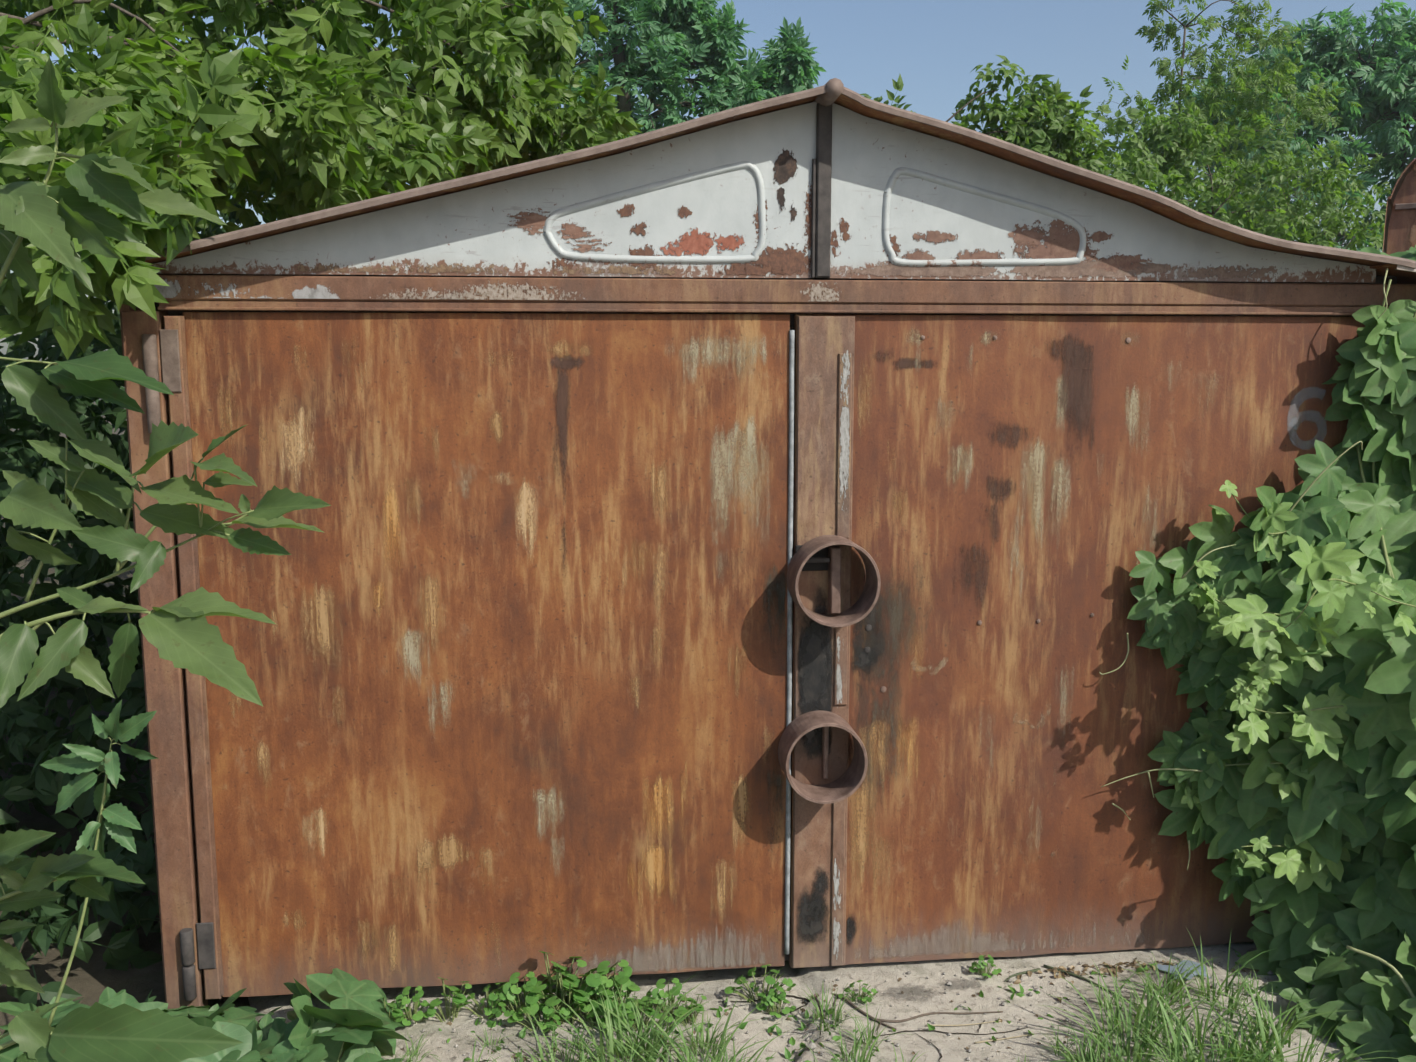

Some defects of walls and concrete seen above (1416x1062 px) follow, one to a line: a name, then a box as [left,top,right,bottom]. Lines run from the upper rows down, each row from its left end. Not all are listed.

peeling [508,183,842,302]
peeling [831,218,851,258]
peeling [883,219,1152,274]
peeling [154,278,340,299]
peeling [370,280,587,300]
rust [552,343,588,474]
rust [1052,335,1094,448]
rust [518,483,535,549]
rust [304,588,333,652]
rust [309,810,325,849]
rust [418,836,492,872]
rust [633,778,683,892]